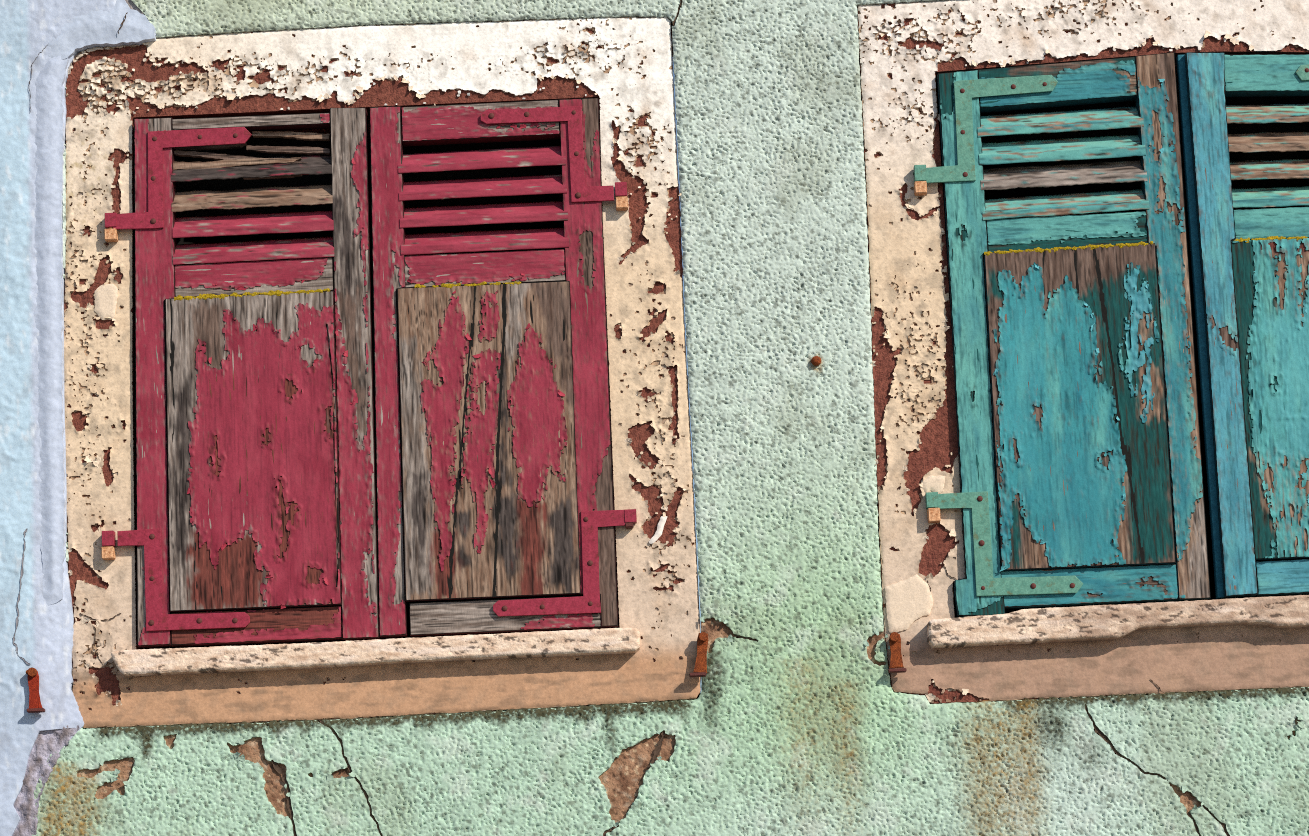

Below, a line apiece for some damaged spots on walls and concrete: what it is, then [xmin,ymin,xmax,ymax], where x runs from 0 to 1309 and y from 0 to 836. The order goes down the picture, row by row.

peeling [65,44,600,123]
peeling [878,18,1309,76]
peeling [611,120,649,265]
peeling [648,184,683,295]
peeling [624,365,686,546]
peeling [863,183,959,667]
crack [272,761,296,836]
crack [319,720,383,836]
flaking render [598,731,676,827]
crack [646,732,666,770]
crack [1085,705,1165,779]
crack [1188,805,1230,836]